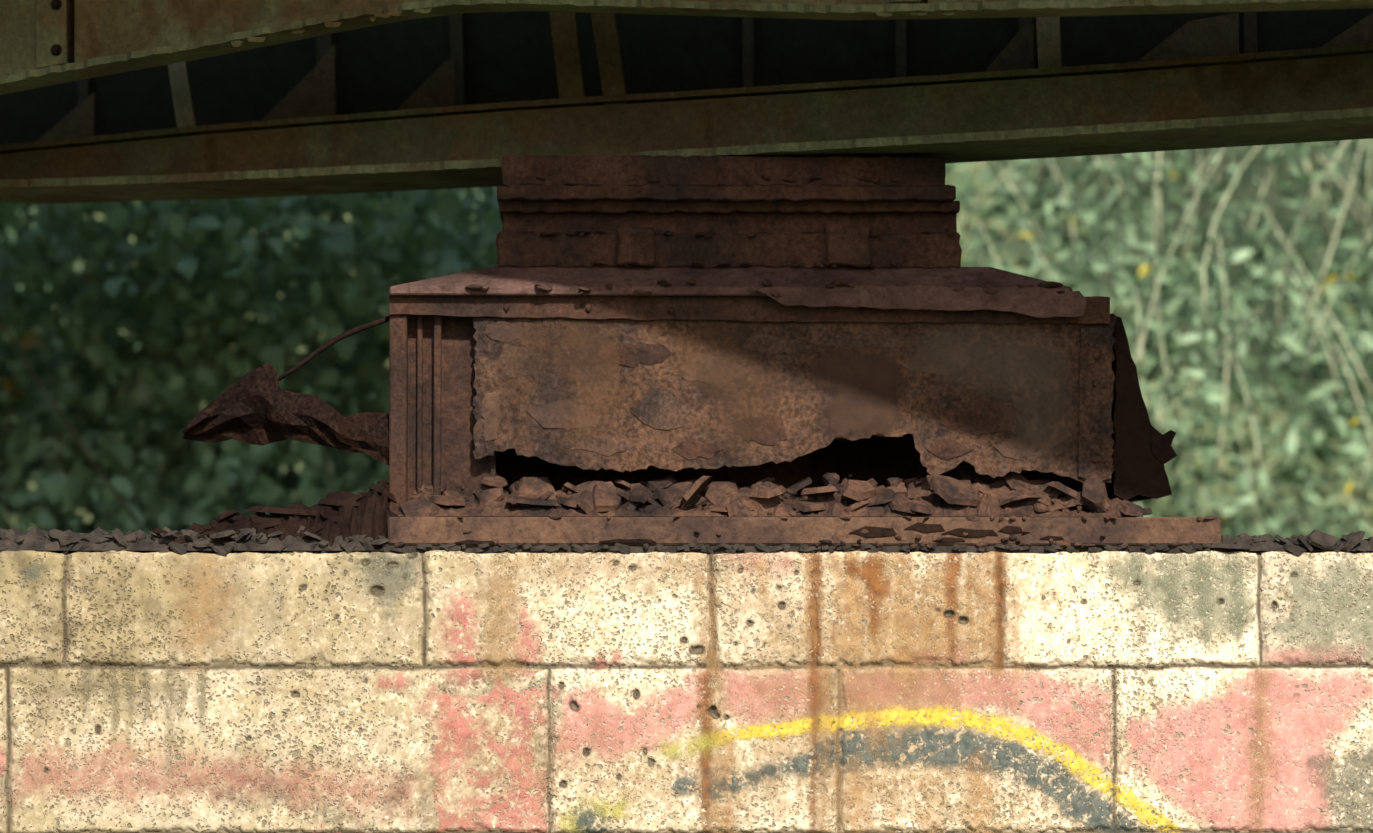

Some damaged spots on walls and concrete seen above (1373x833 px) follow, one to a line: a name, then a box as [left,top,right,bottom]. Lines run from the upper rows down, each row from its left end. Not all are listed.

corrosion [809,554,821,740]
corrosion [848,555,888,634]
corrosion [947,553,960,651]
corrosion [995,552,1006,668]